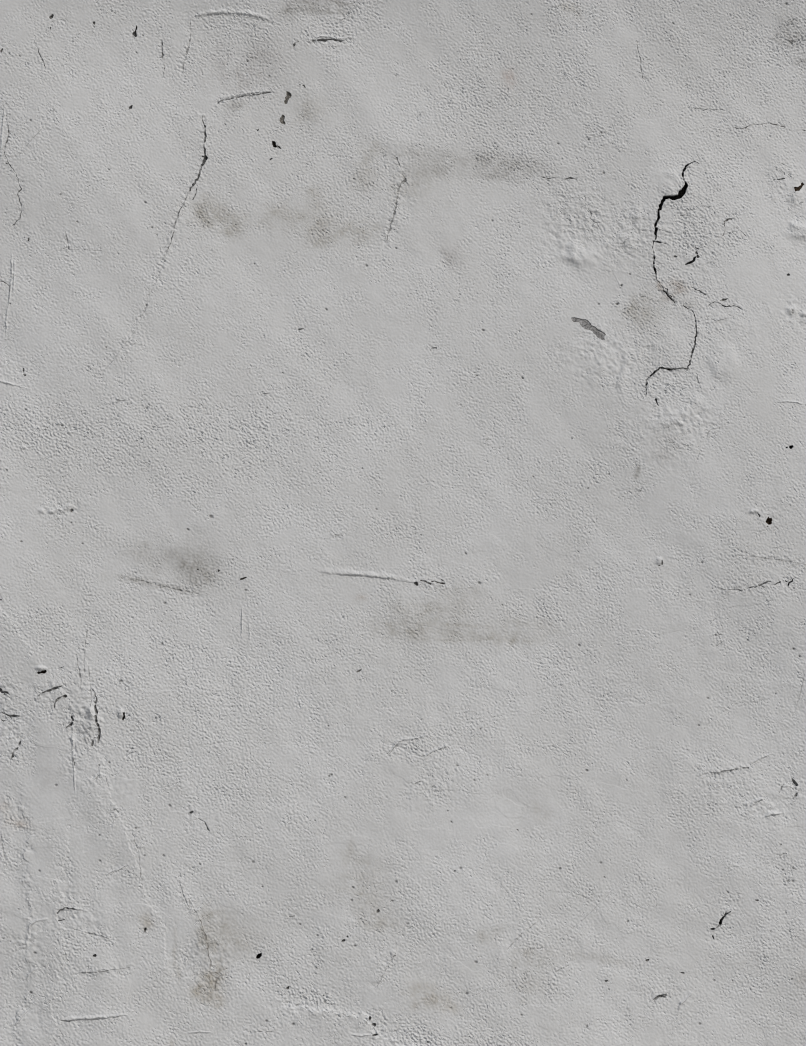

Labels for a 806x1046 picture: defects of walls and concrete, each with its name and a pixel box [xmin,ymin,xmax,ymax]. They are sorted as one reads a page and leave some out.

crack [644,160,748,407]